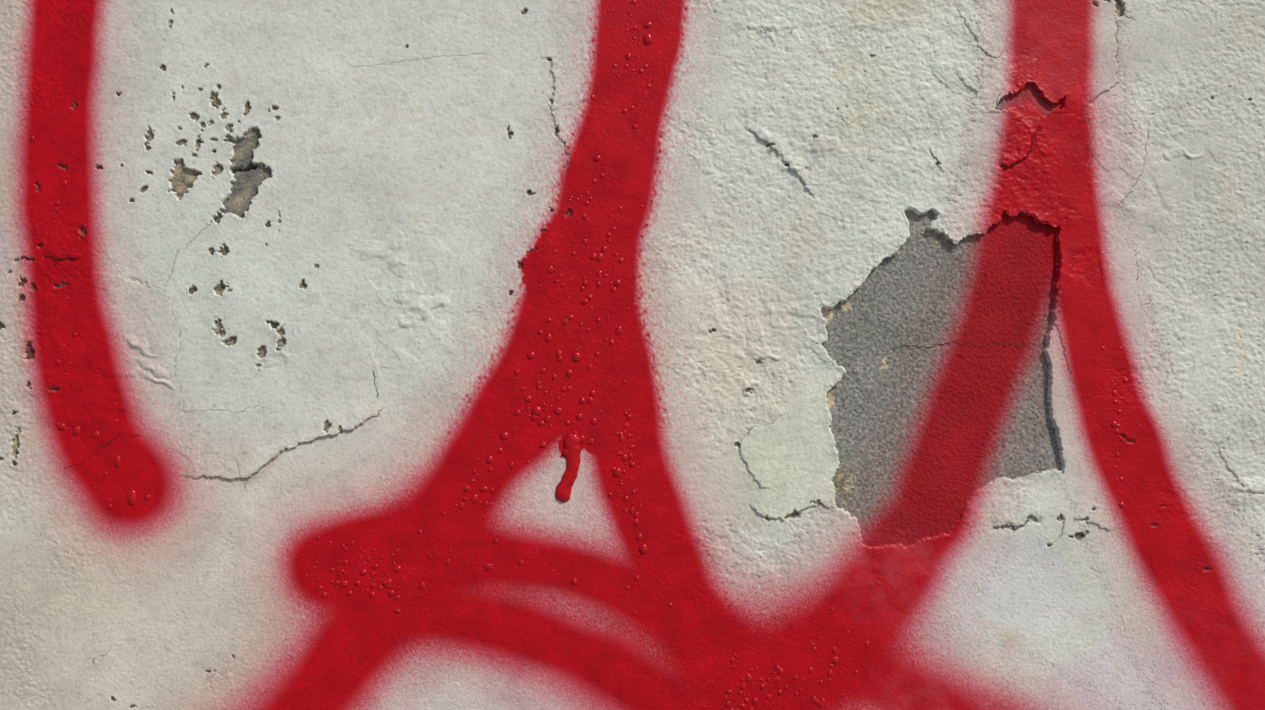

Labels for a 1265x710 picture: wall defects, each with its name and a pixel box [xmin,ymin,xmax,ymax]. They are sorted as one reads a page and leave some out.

flaking render [169,85,272,223]
crack [1000,129,1039,168]
flaking render [7,244,43,302]
crack [26,224,383,485]
flaking render [214,317,236,346]
flaking render [256,320,286,371]
peeling [810,206,1063,520]